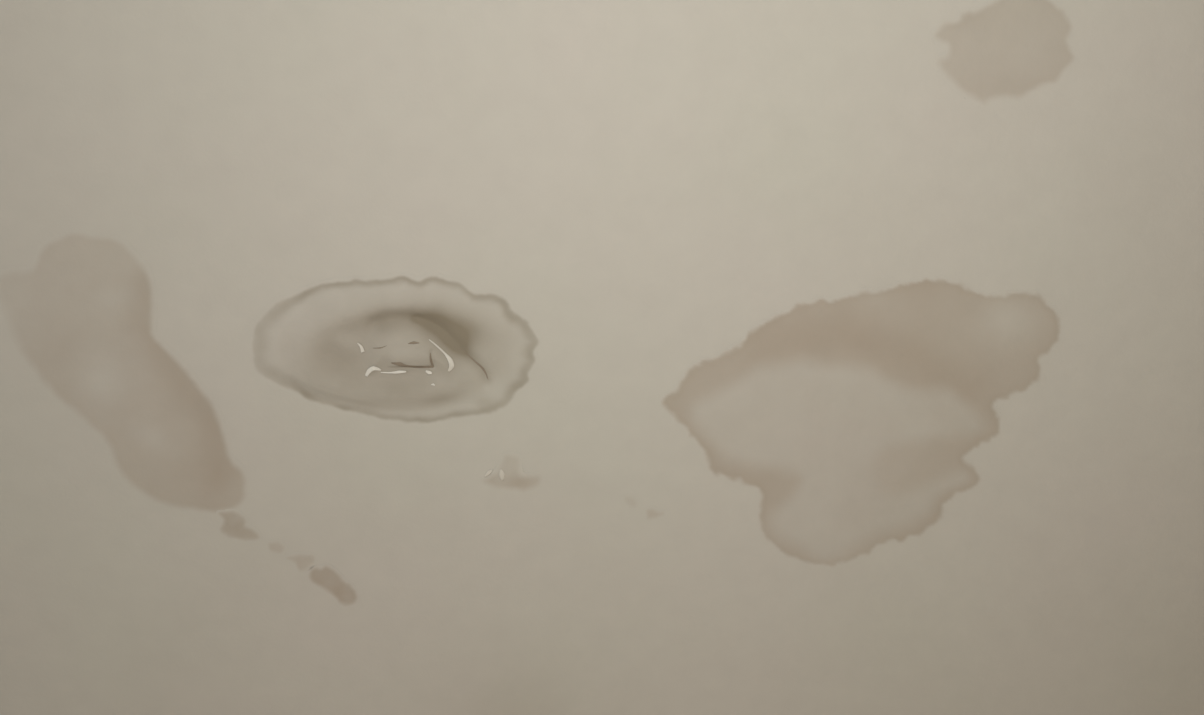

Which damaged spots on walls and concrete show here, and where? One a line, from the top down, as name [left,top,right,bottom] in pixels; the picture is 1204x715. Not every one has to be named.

leakage [932,0,1078,107]
leakage [0,231,360,608]
leakage [660,276,1064,569]